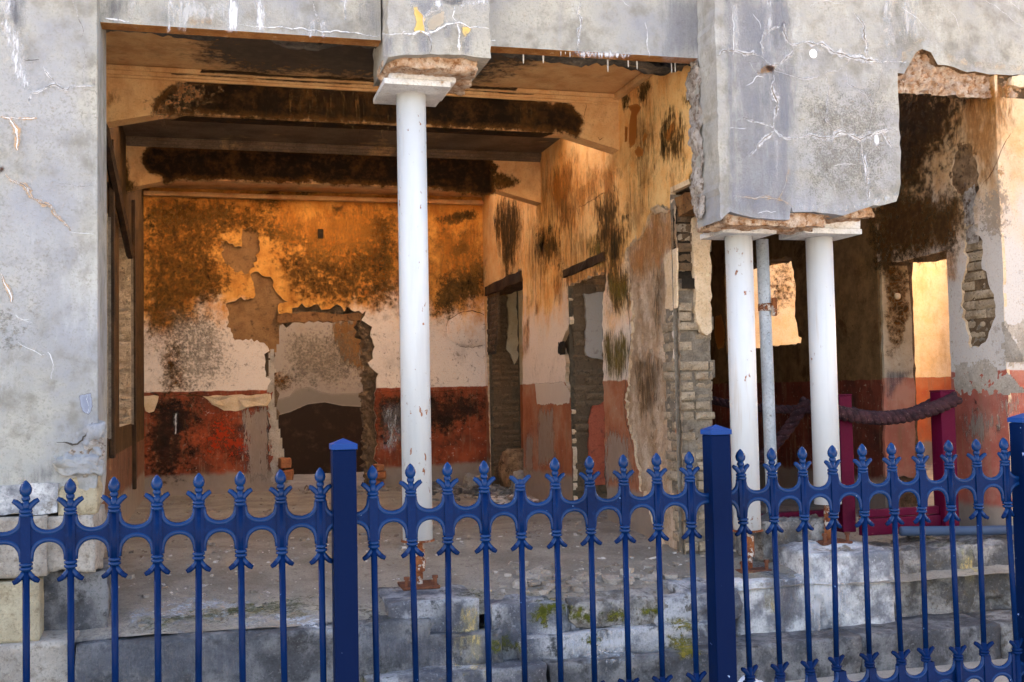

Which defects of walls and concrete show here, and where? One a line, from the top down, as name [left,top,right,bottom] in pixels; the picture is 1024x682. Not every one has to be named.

crack [241,0,496,53]
crack [719,0,906,201]
spalling [898,51,1024,104]
crack [6,174,90,234]
damp [144,198,401,484]
flaking render [197,228,375,484]
damp [431,391,486,435]
damp [494,163,671,339]
damp [634,350,659,418]
flaking render [604,204,695,555]
flaking render [949,142,1024,445]